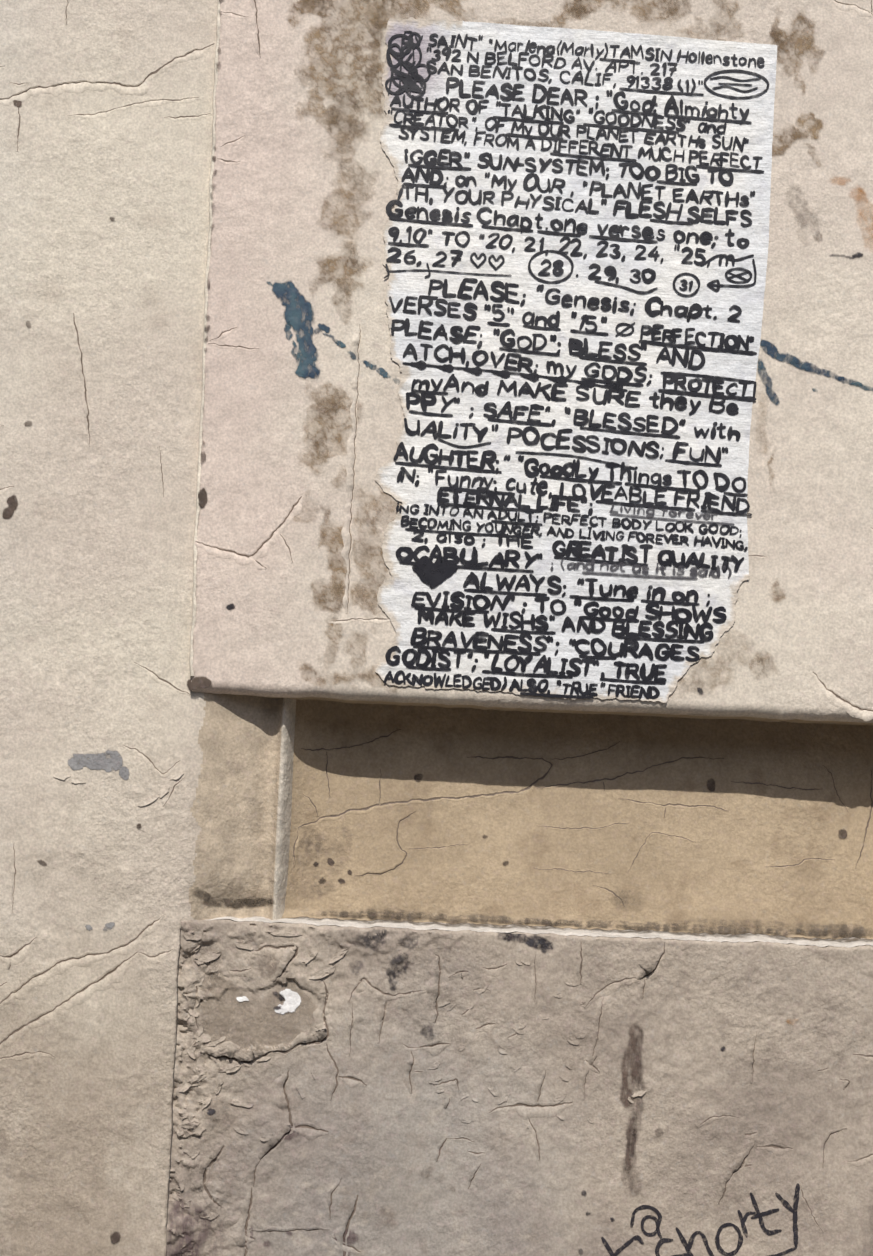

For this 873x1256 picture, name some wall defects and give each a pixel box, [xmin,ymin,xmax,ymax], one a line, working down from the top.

crack [71,313,91,446]
water stain [323,333,388,378]
crack [194,496,303,570]
crack [811,671,873,721]
crack [292,729,873,907]
crack [0,914,173,1062]
peeling [177,927,317,1169]
crack [229,942,301,983]
peeling [302,948,349,979]
crack [183,953,538,1256]
crack [489,942,666,1160]
water stain [620,1026,643,1169]